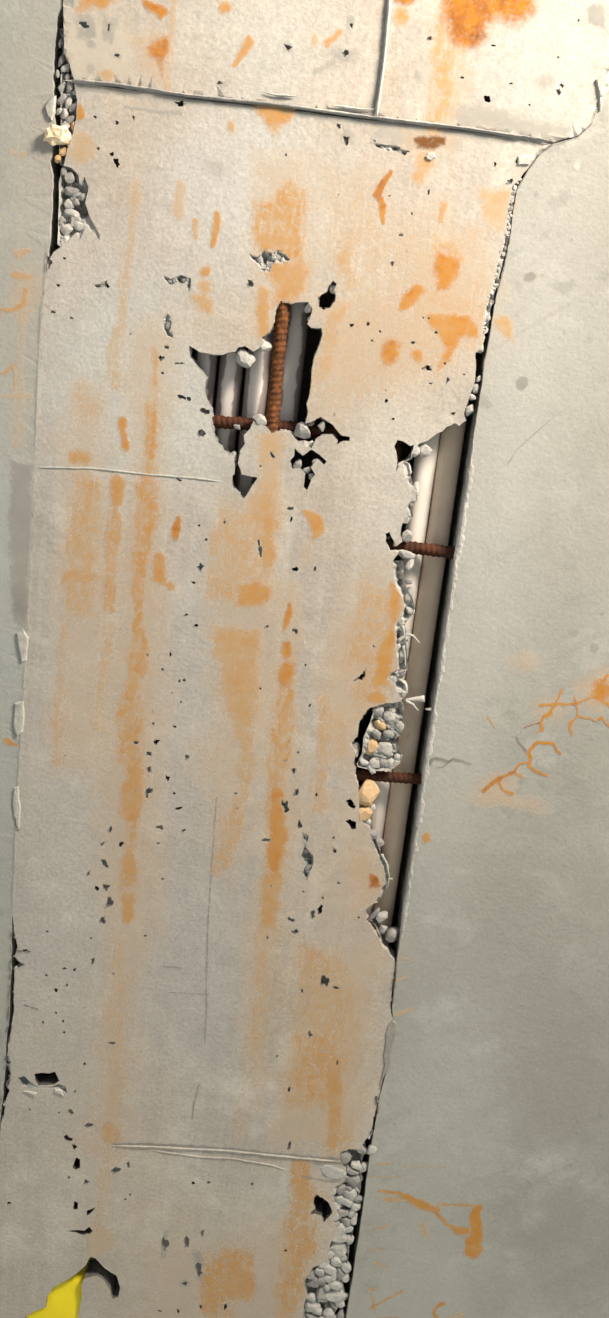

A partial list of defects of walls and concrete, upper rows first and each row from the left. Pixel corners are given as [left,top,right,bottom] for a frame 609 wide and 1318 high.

spalling [45,28,100,247]
corrosion [414,0,536,179]
spalling [162,314,173,338]
spalling [163,275,191,292]
spalling [189,301,350,498]
corrosion [317,170,512,409]
corrosion [208,432,286,606]
corrosion [55,348,175,924]
corrosion [210,603,294,1057]
spalling [355,435,474,961]
corrosion [481,674,609,808]
corrosion [368,1162,483,1259]